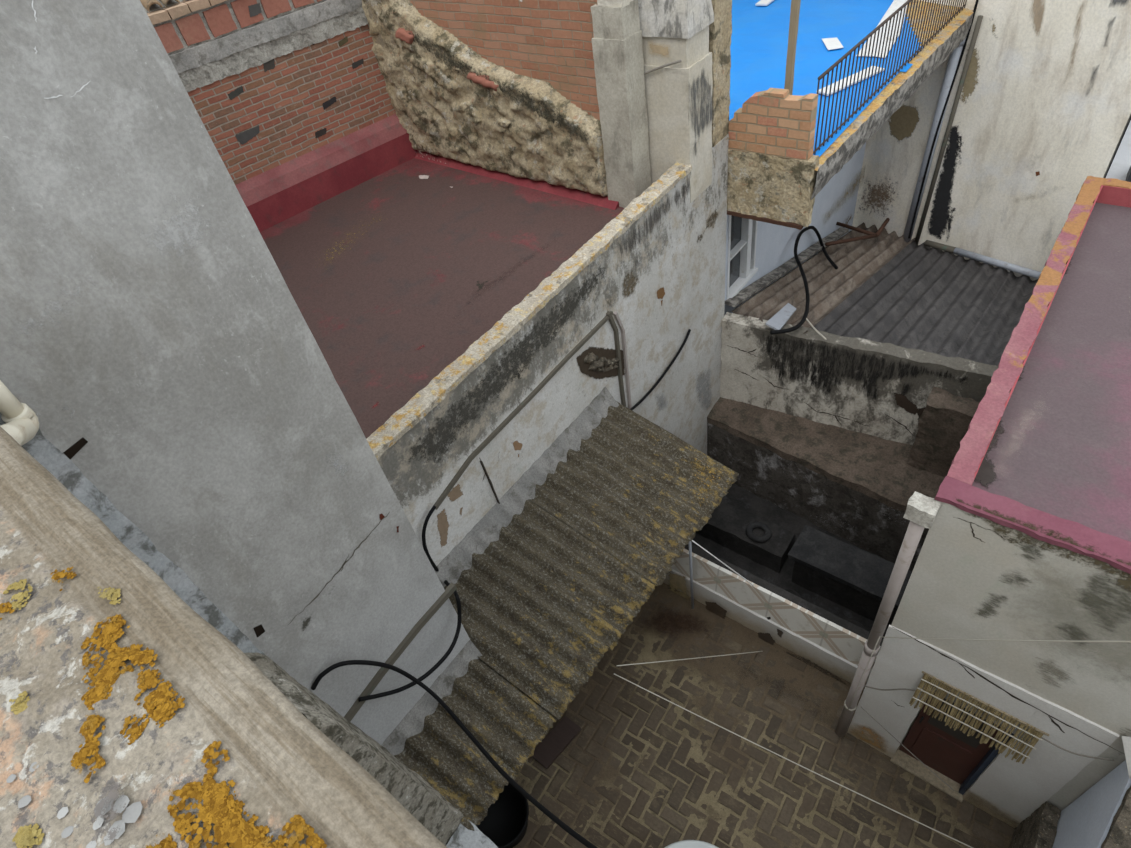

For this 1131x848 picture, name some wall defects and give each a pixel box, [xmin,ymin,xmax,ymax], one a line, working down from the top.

mould [688,68,713,154]
damp [828,175,898,228]
damp [928,126,962,242]
damp [409,267,606,463]
spalling [576,346,625,380]
damp [760,336,966,399]
peeling [437,484,463,547]
damp [956,499,1131,631]
crack [893,627,1124,754]